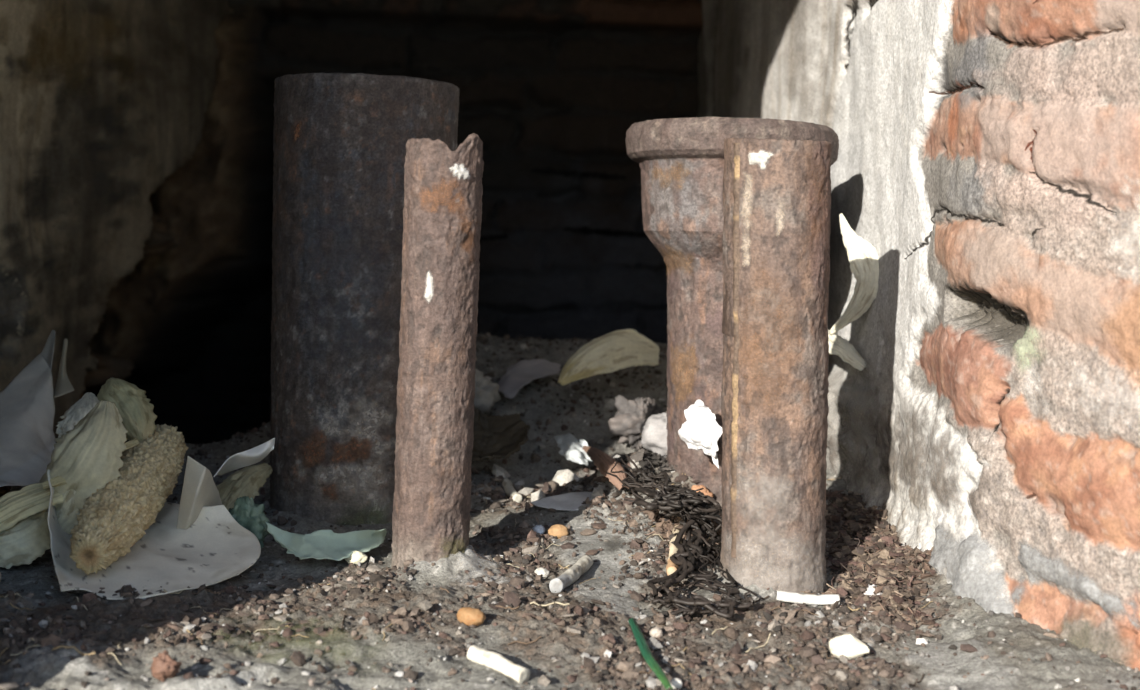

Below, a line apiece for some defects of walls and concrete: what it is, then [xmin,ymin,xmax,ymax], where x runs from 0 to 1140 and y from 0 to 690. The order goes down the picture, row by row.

crack [1025,129,1117,216]